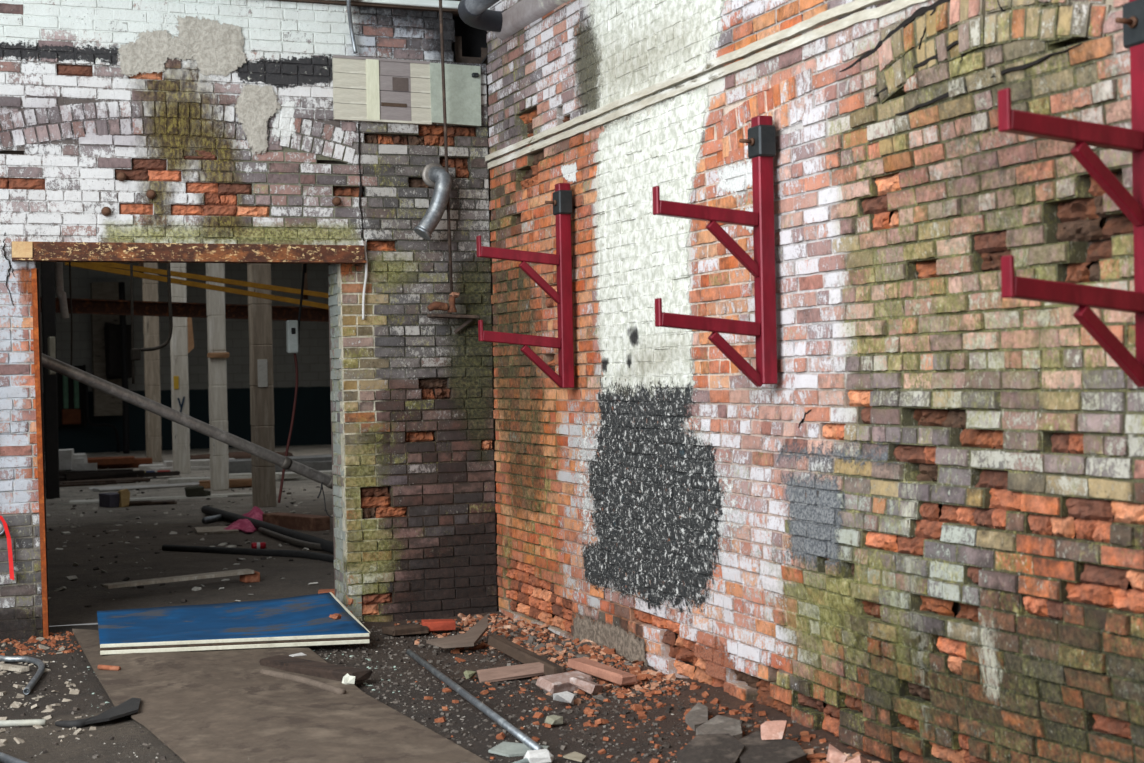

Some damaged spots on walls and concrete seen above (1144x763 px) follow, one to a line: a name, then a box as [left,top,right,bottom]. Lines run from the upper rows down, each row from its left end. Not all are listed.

crack [839,0,1081,115]
damp [144,106,237,224]
peeling [561,162,578,182]
damp [202,199,240,235]
spalling [1056,176,1133,284]
peeling [571,0,1004,763]
damp [898,478,917,536]
spalling [865,469,1144,556]
damp [399,521,498,621]
spalling [506,559,573,633]
spalling [1023,563,1144,621]
damp [979,621,1002,703]